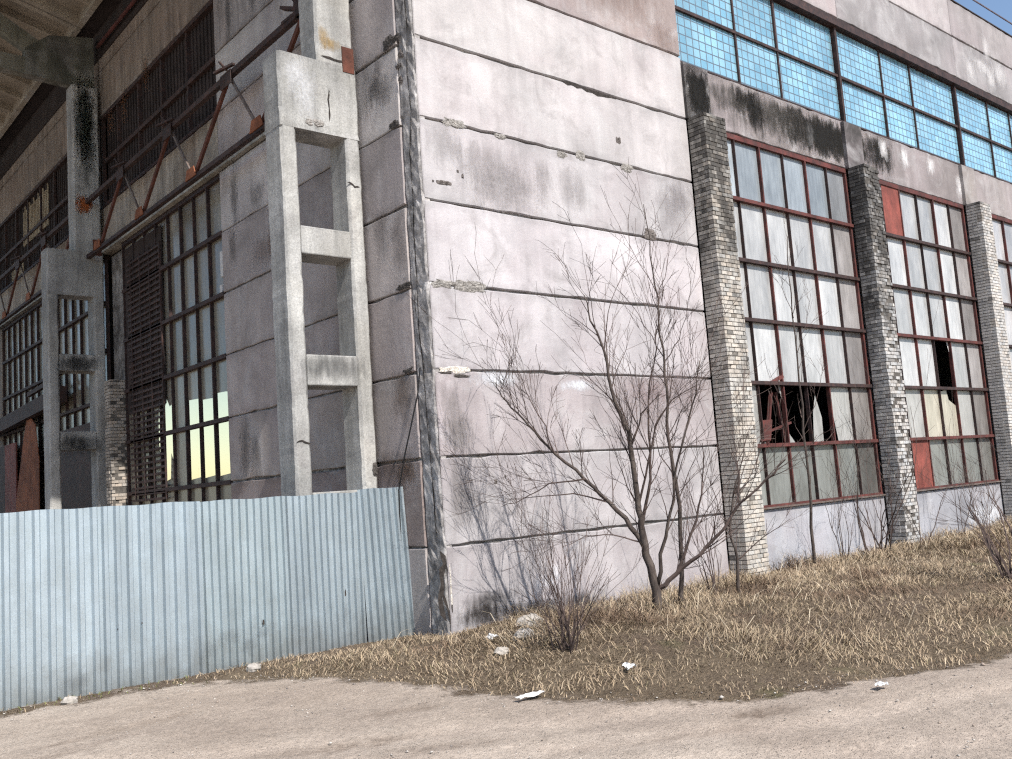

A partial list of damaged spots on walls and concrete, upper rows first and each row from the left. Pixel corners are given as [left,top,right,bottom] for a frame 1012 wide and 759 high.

leakage [691,78,707,111]
leakage [77,92,92,171]
leakage [732,91,844,156]
leakage [862,140,890,169]
spalling [431,279,486,292]